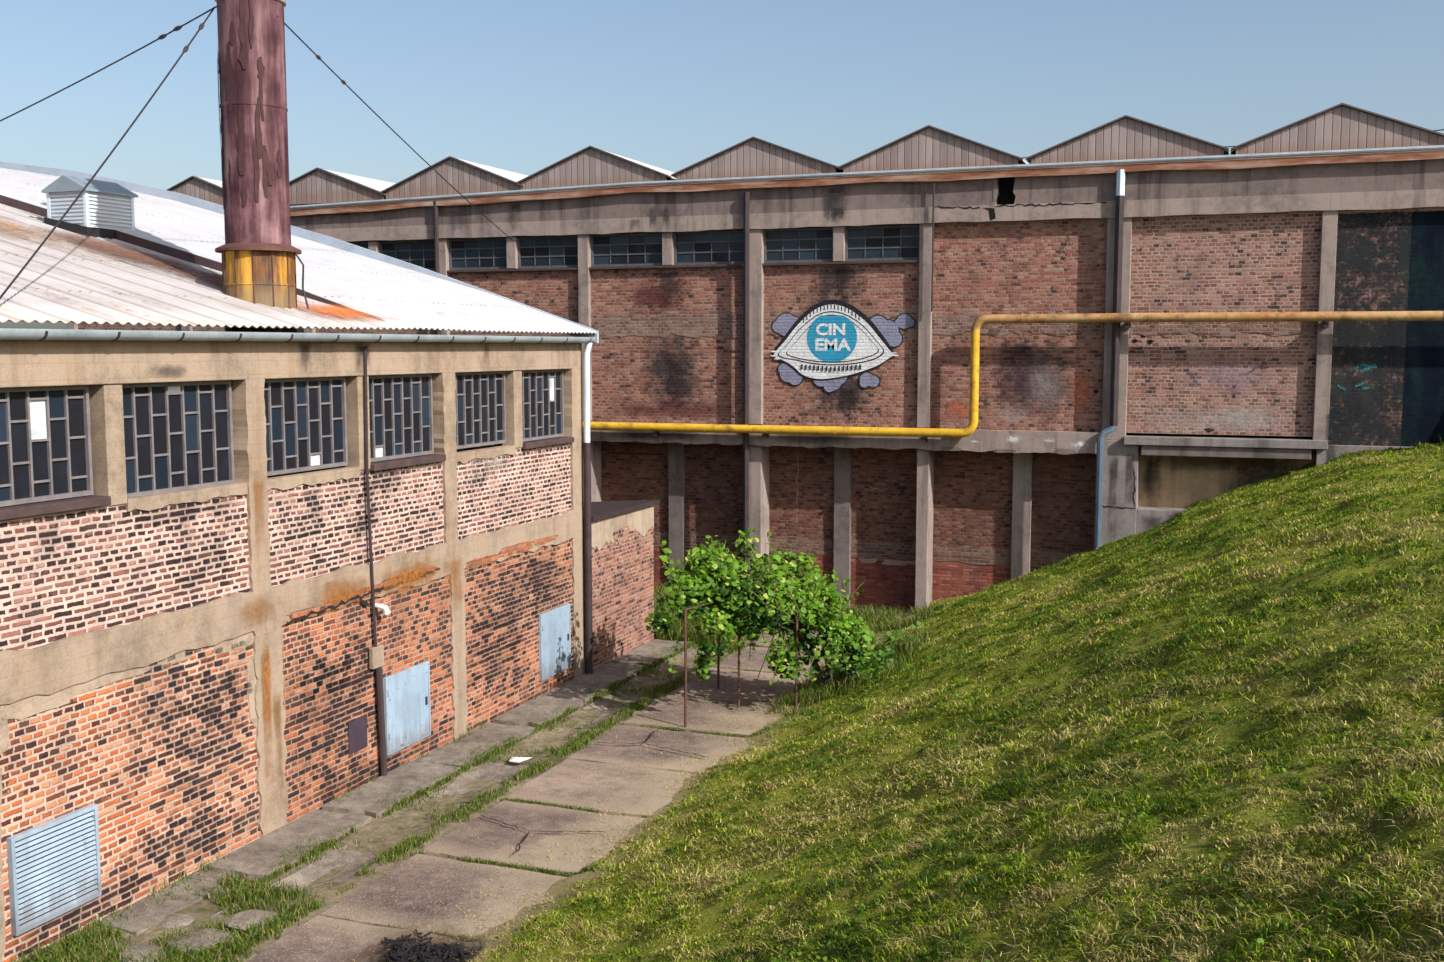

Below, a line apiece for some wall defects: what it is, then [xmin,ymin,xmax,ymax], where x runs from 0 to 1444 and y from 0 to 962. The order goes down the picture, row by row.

spalling [985,177,1016,220]
damp [624,335,708,438]
peeling [212,632,258,729]
damp [298,631,423,804]
rust [390,564,428,588]
damp [472,548,565,704]
peeling [0,649,194,956]
damp [27,647,247,949]